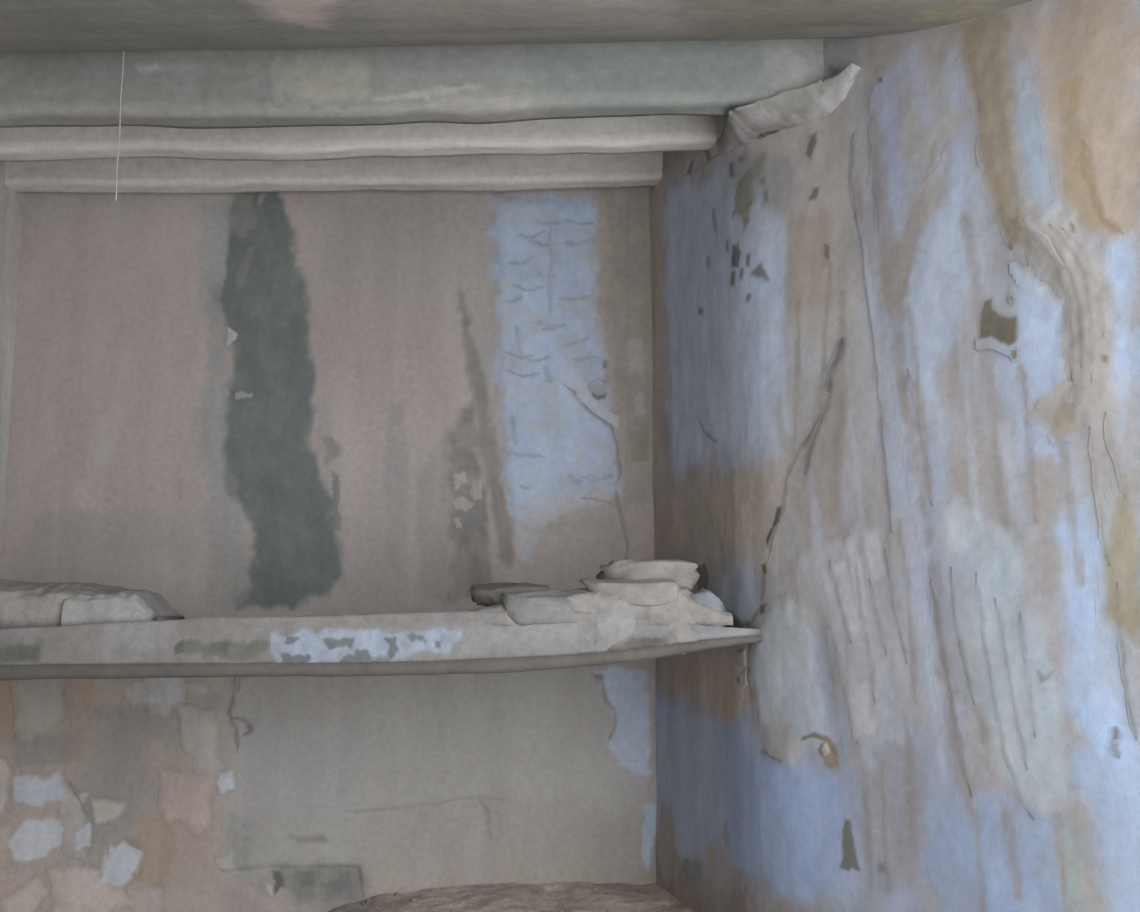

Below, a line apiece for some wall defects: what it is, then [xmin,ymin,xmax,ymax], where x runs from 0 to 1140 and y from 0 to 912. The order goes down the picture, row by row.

peeling [712,148,772,305]
water stain [188,192,347,616]
peeling [484,189,621,571]
crack [735,133,892,701]
peeling [975,259,1066,400]
peeling [0,756,165,912]
peeling [123,678,236,836]
crack [225,677,255,754]
peeling [268,625,465,663]
peeling [591,663,654,778]
peeling [639,799,657,873]
flaking render [839,814,863,875]